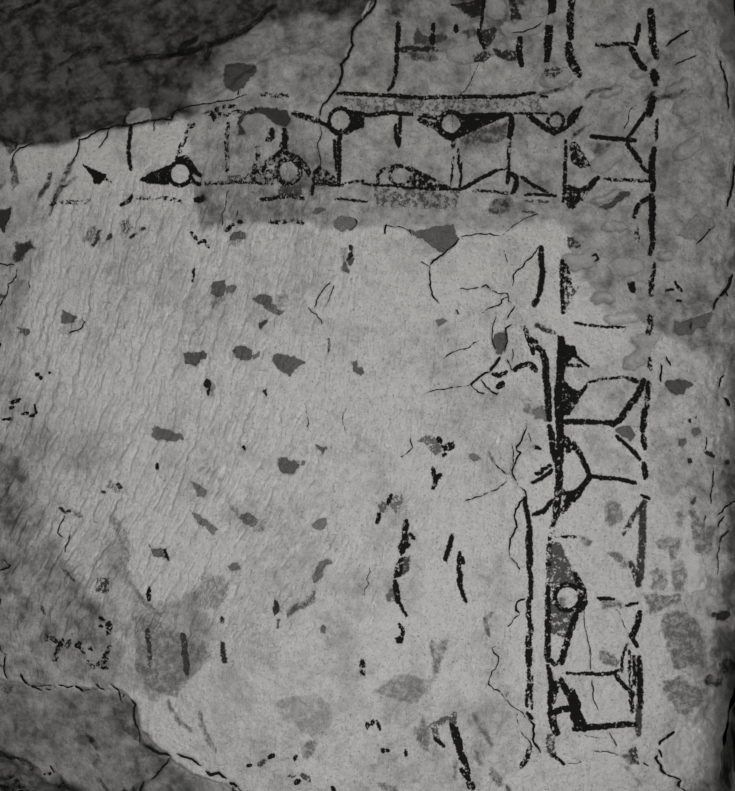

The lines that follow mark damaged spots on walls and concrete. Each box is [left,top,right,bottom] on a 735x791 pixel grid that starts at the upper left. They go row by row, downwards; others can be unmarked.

spalling [223,63,257,91]
spalling [237,107,291,135]
crack [317,0,377,176]
crack [451,65,478,128]
spalling [383,224,459,253]
crack [421,214,539,304]
crack [428,245,540,395]
crack [0,646,241,791]
crack [568,733,618,764]
crack [643,731,686,791]